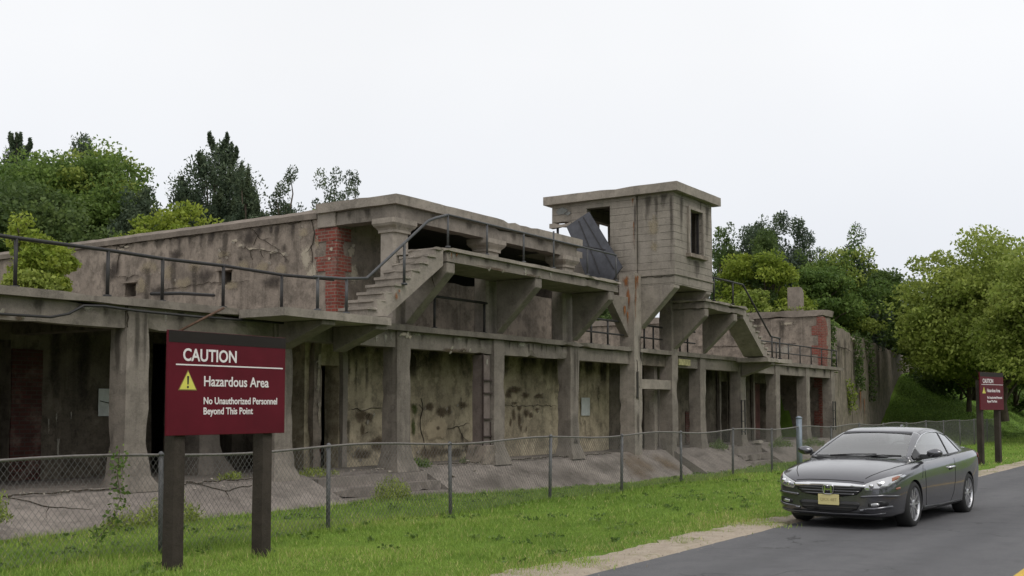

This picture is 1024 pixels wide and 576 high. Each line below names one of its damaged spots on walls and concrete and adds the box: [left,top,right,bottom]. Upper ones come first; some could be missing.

crack [83,232,214,327]
crack [168,220,319,289]
crack [420,399,481,465]
crack [511,453,611,461]